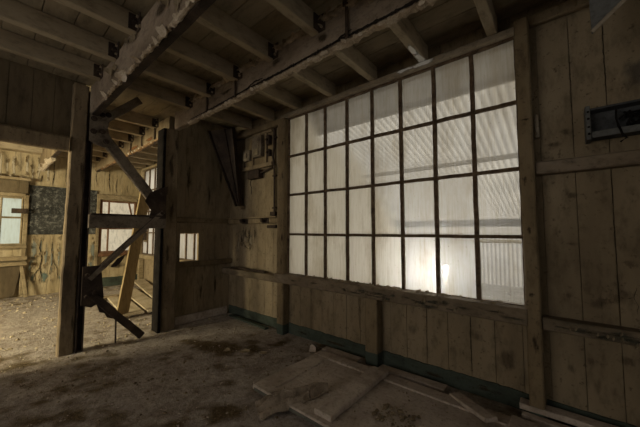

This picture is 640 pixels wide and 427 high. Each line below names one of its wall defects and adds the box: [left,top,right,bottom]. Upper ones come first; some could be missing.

peeling [100,0,199,100]
crack [190,0,419,120]